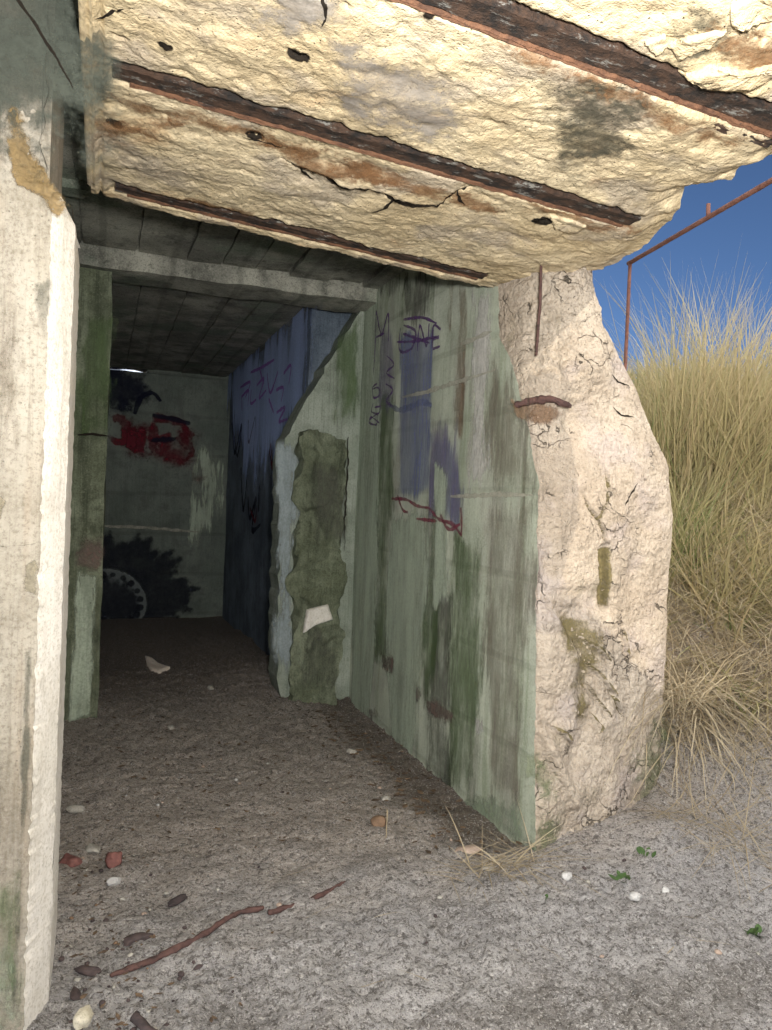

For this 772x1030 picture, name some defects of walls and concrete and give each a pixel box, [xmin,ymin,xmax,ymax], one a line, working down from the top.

crack [16,0,73,88]
crack [320,0,328,26]
corrosion [715,33,772,69]
spalling [7,18,65,216]
corrosion [94,112,498,213]
crack [242,136,466,213]
water stain [547,79,648,167]
corrosion [574,73,736,146]
water stain [468,292,497,481]
water stain [351,273,451,786]
crack [584,477,637,544]
spalling [303,604,333,633]